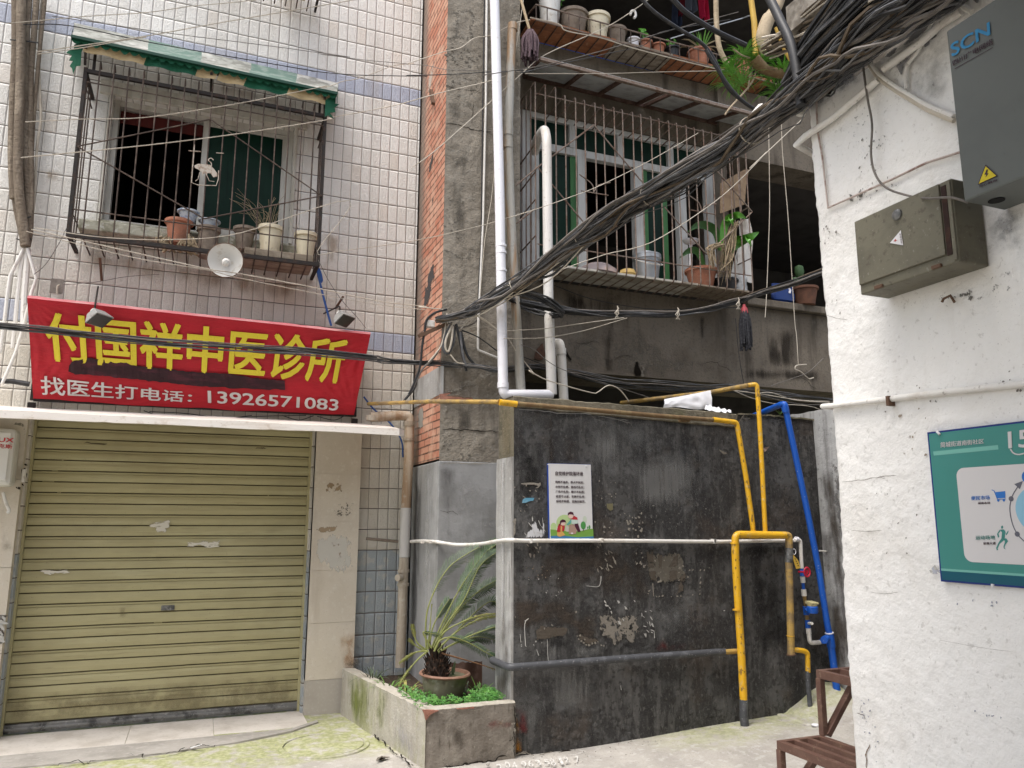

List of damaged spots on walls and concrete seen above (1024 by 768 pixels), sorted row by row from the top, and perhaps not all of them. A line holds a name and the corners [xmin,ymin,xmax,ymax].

water stain [643,461,692,502]